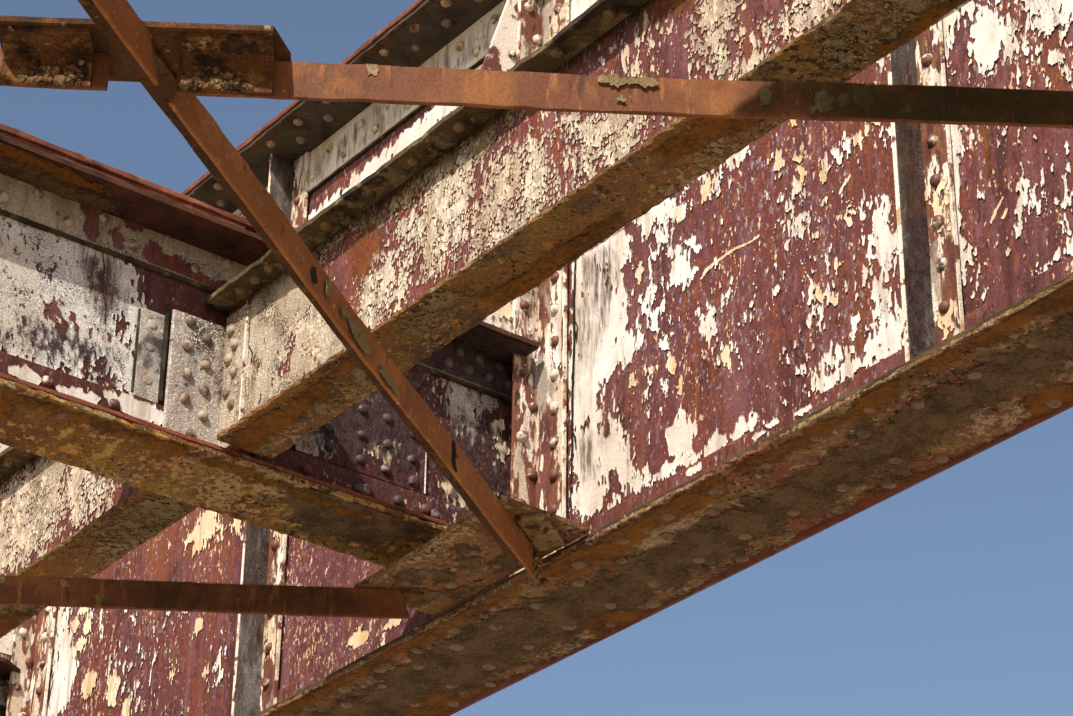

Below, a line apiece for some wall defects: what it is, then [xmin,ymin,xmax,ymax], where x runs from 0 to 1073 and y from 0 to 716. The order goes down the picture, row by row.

corrosion [177,66,253,93]
water stain [80,244,121,320]
peeling [0,204,227,425]
corrosion [351,231,381,280]
peeling [243,0,823,417]
corrosion [473,214,631,305]
peeling [526,142,779,523]
peeling [764,121,904,416]
peeling [925,125,1073,306]
corrosion [0,387,376,526]
corrosion [270,284,1073,716]
peeling [47,594,232,716]